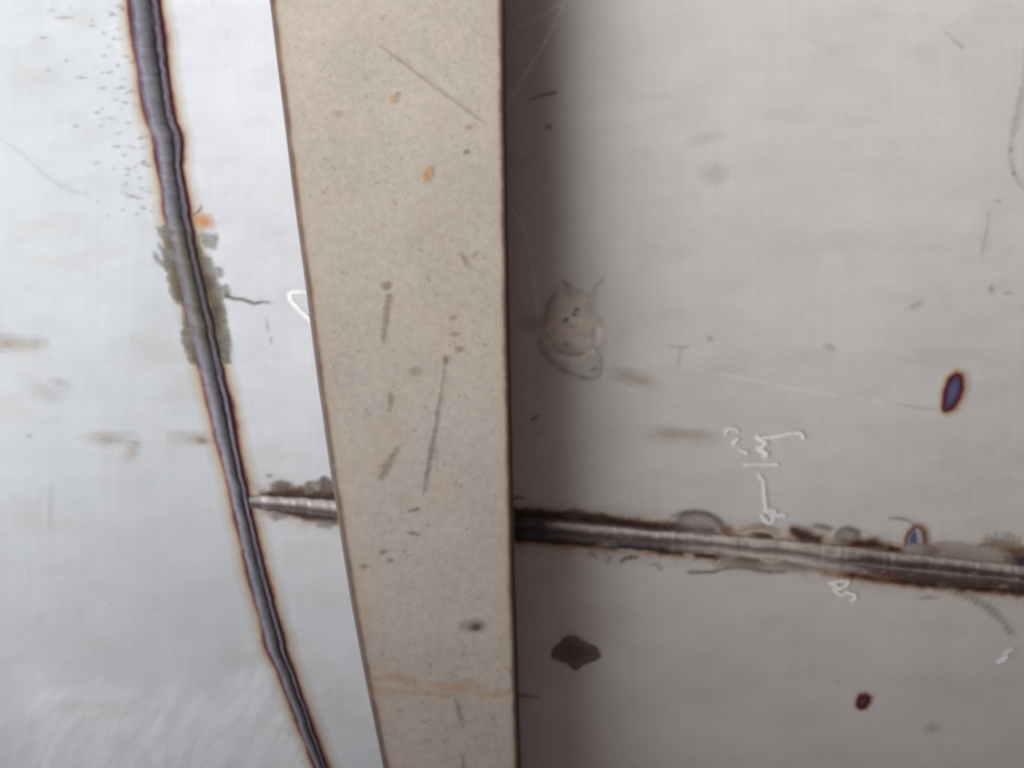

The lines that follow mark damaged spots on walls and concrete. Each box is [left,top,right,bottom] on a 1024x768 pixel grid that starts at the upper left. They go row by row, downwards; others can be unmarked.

leakage [155,227,198,364]
leakage [193,224,230,364]